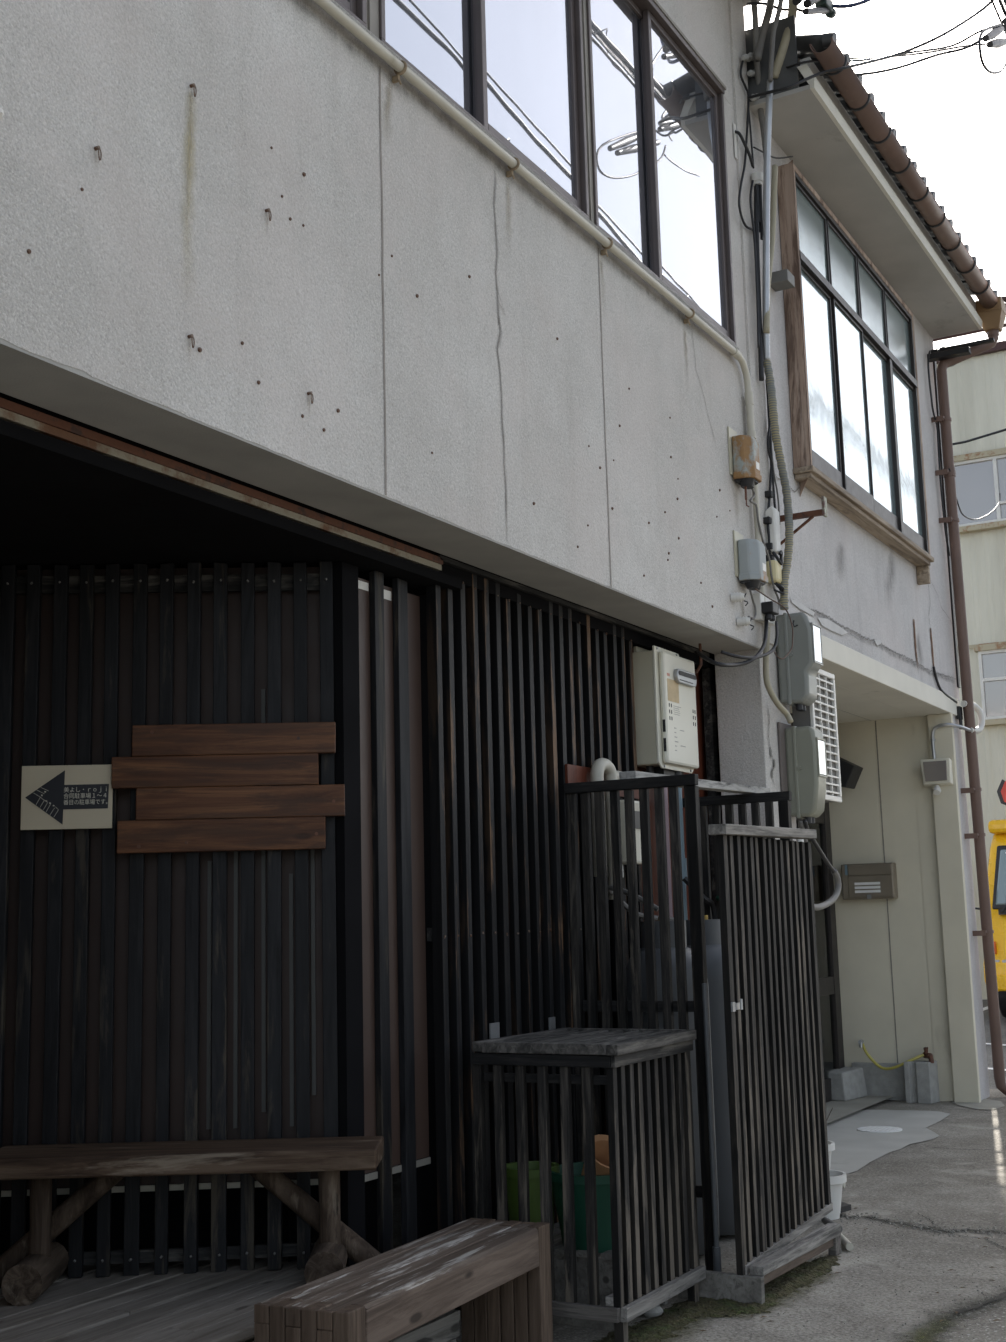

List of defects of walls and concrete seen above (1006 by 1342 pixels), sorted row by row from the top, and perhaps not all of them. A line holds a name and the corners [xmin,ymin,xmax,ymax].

crack [494,196,507,528]